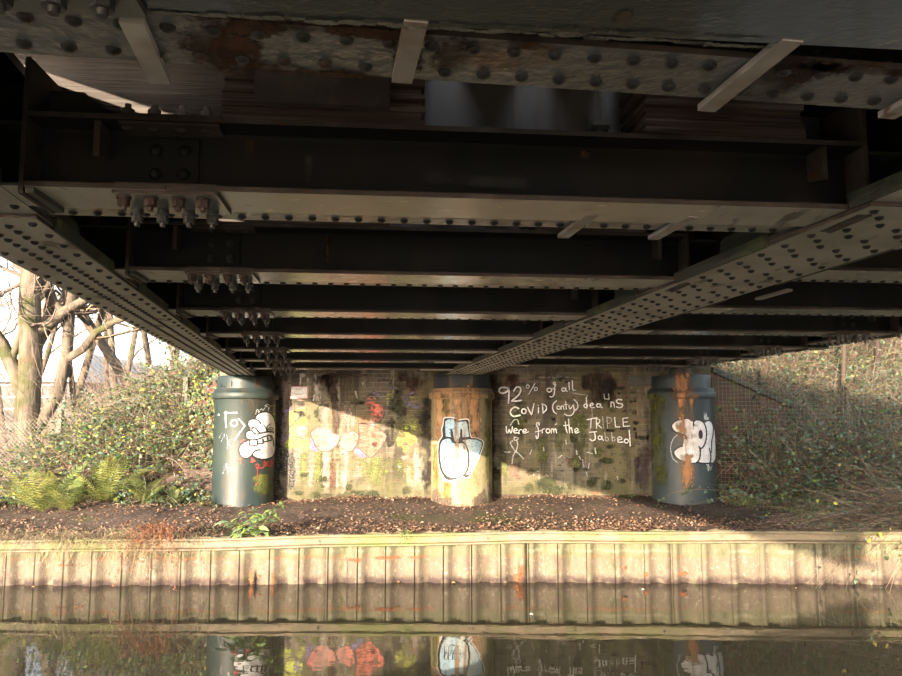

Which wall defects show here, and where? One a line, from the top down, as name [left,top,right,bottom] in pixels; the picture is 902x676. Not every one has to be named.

rust [179,18,303,75]
rust [321,25,401,62]
damp [299,373,353,435]
damp [581,373,625,407]
rust [673,373,696,440]
damp [323,445,349,491]
damp [634,430,651,492]
rust [681,454,694,490]